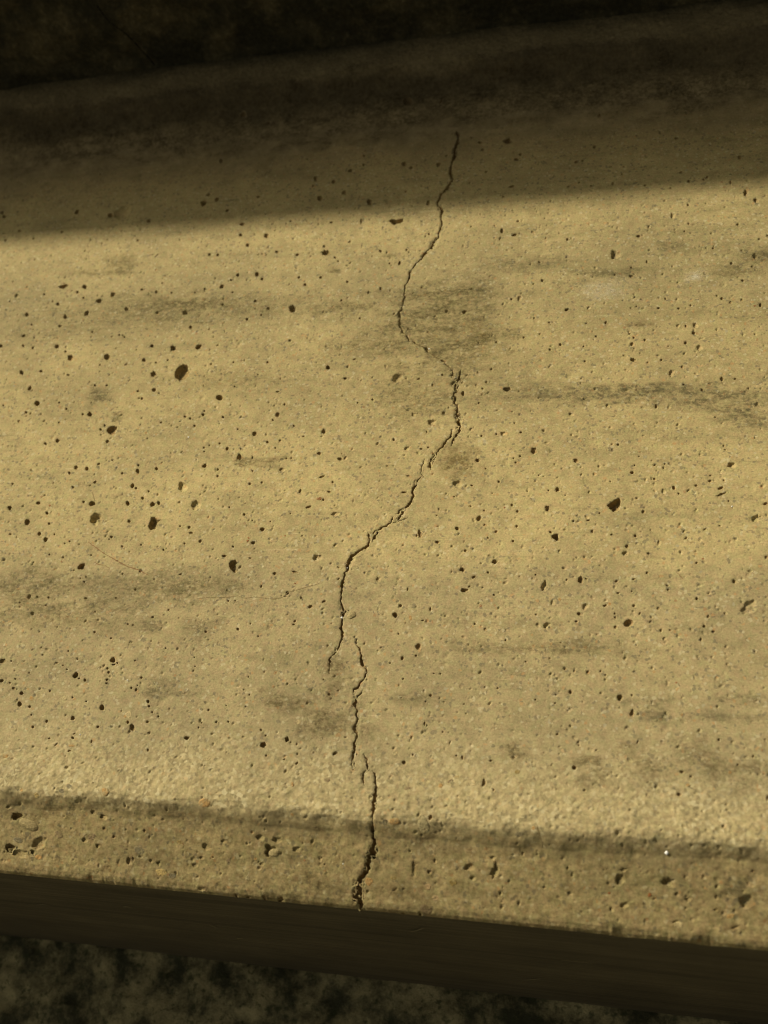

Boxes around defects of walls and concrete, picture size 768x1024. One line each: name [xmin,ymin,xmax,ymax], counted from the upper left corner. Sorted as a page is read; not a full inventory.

crack [197,131,464,911]